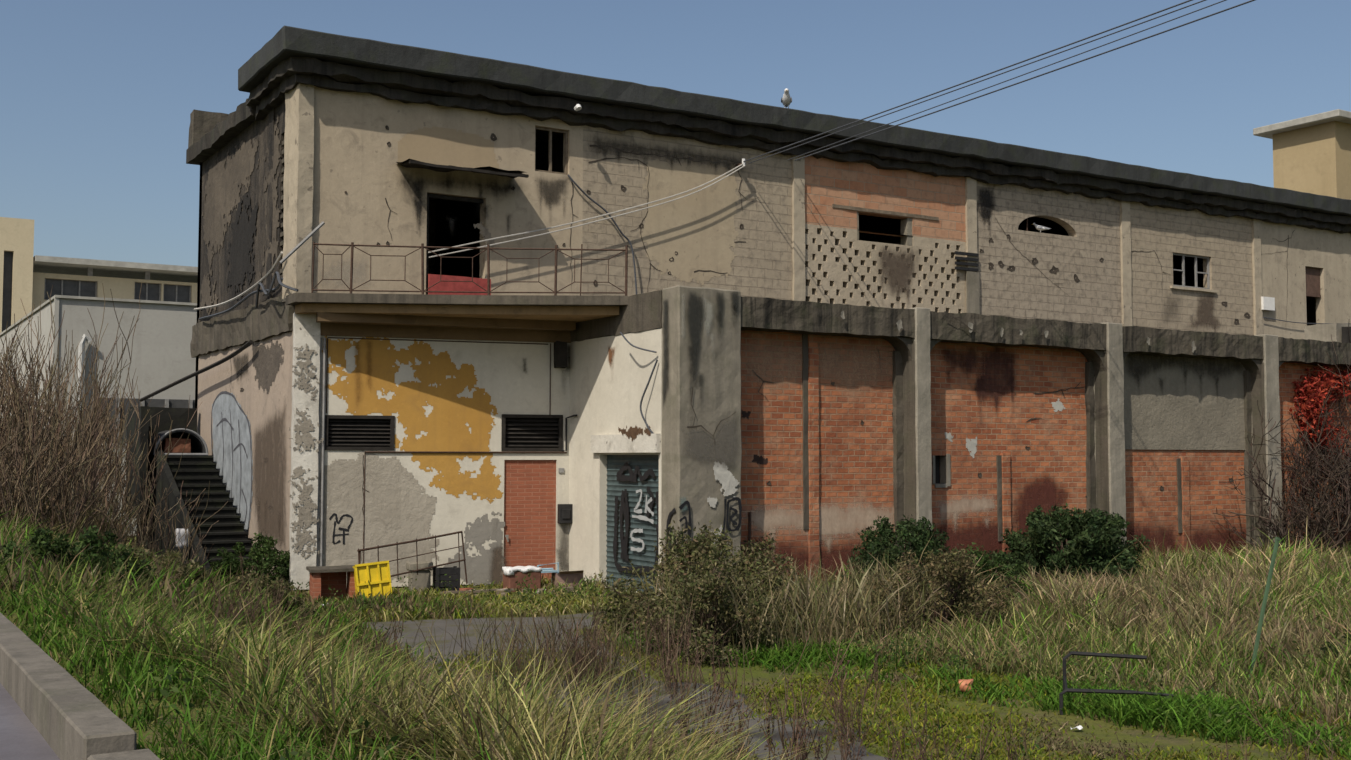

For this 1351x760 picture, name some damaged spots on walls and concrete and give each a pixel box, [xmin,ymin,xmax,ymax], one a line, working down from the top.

leakage [687,292,738,392]
peeling [240,336,503,582]
spalling [707,461,740,508]
leakage [745,505,894,578]
leakage [937,497,1002,556]
leakage [1015,477,1066,536]